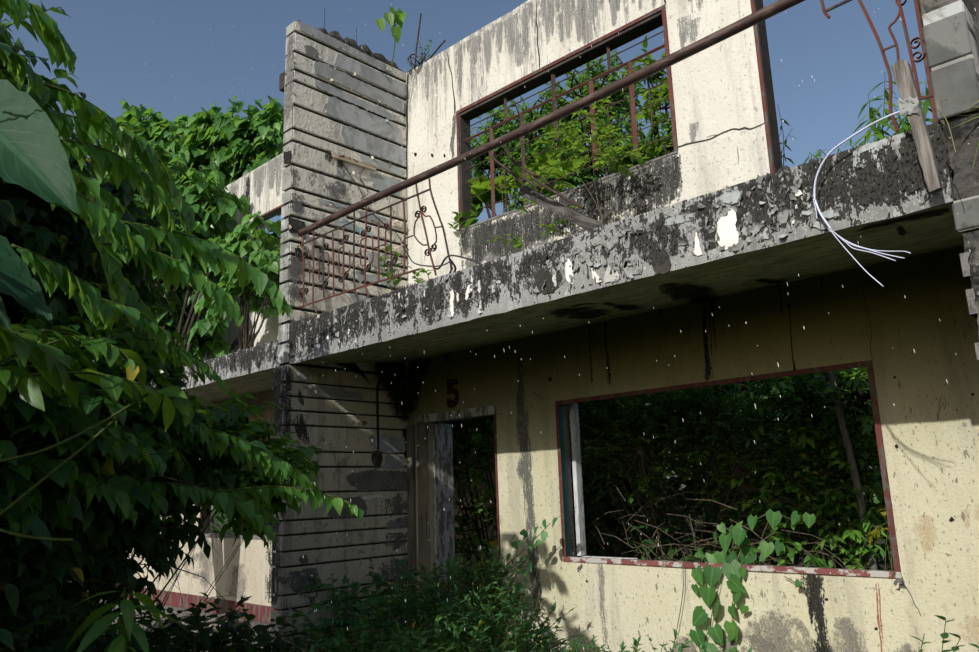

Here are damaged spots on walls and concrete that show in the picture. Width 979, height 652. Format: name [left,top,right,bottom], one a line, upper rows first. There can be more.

leakage [457,0,620,92]
leakage [677,0,703,49]
crack [678,123,764,153]
peeling [851,139,888,168]
spalling [287,217,313,259]
peeling [318,198,390,236]
peeling [301,252,502,351]
leakage [270,153,683,458]
peeling [533,168,842,294]
leakage [659,283,726,380]
spalling [963,230,979,341]
leakage [515,356,541,608]